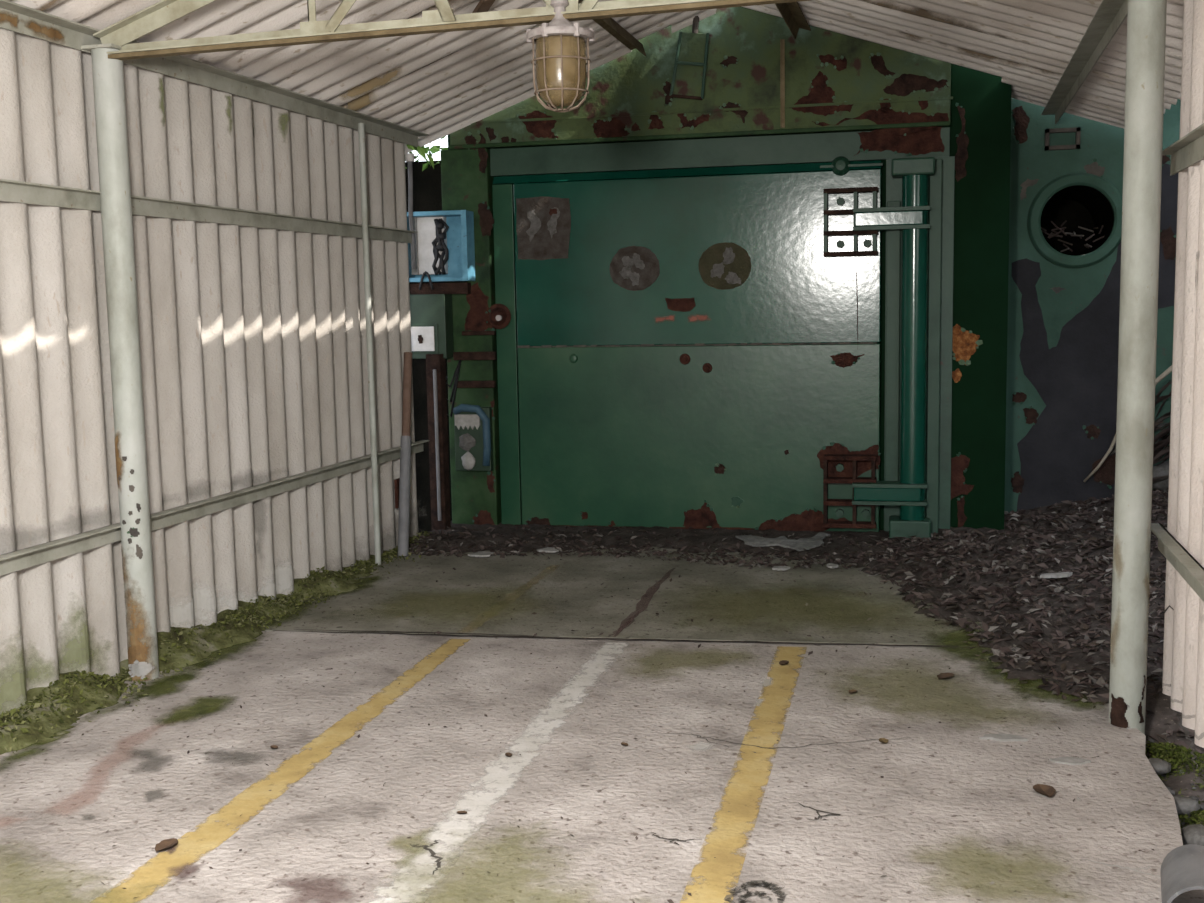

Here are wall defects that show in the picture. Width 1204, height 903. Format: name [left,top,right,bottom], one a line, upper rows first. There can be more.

rust [854,102,969,182]
rust [952,324,983,383]
rust [115,434,123,488]
rust [817,442,881,477]
rust [667,500,852,531]
rust [121,550,153,681]
crack [275,568,993,648]
damp [0,611,97,715]
rust [1110,675,1146,729]
damp [134,751,166,770]
damp [209,751,258,762]